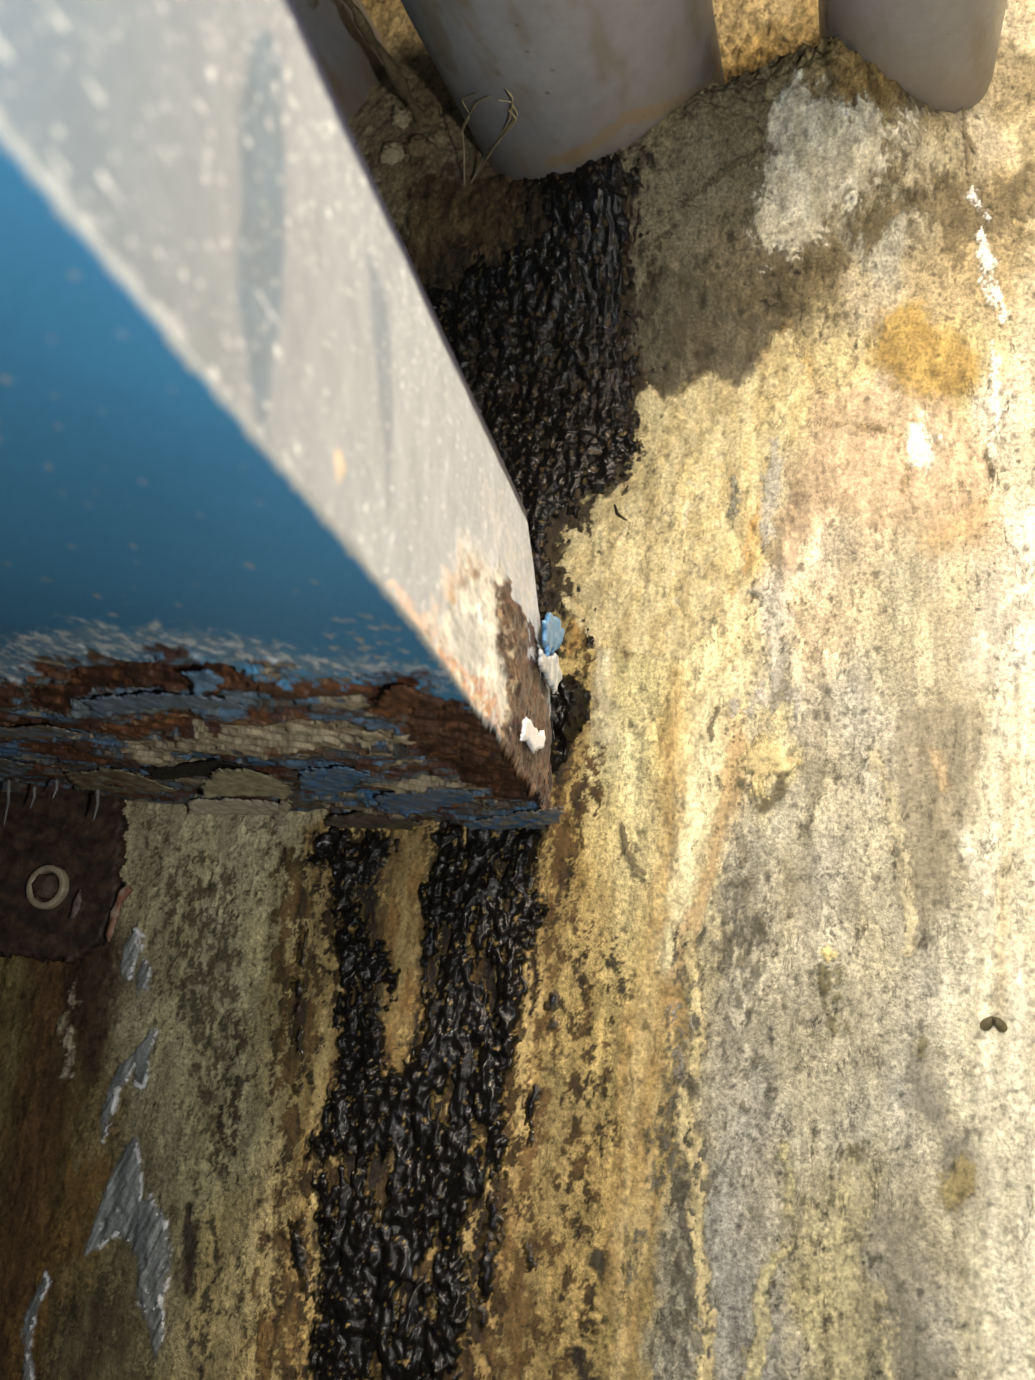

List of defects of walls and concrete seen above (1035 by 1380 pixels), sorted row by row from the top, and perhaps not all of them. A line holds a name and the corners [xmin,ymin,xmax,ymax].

peeling [538,612,565,694]
peeling [80,669,245,712]
peeling [366,684,424,719]
peeling [0,724,88,740]
peeling [520,717,546,753]
water stain [139,145,1035,1380]
peeling [66,759,371,826]
peeling [324,788,476,831]
peeling [462,806,565,831]
corrosion [0,884,133,1380]
water stain [42,1257,155,1380]